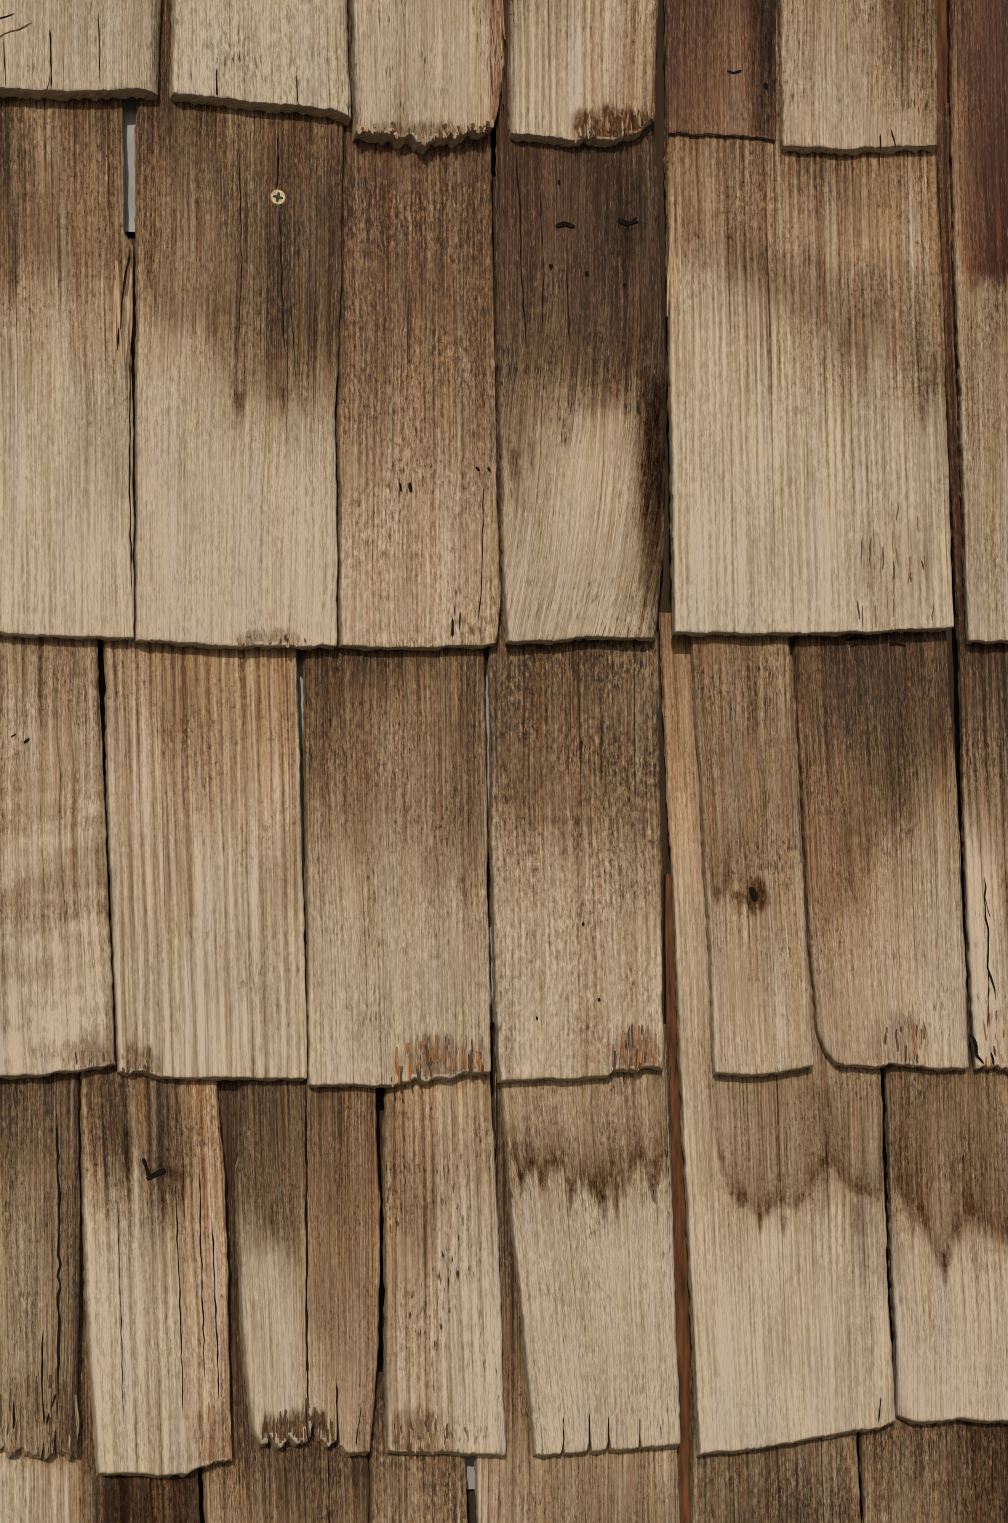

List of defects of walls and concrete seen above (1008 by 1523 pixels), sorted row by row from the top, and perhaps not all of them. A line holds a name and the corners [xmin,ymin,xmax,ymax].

damp [513,1145,564,1191]
damp [580,1146,667,1211]
damp [732,1186,800,1227]
damp [896,1175,1008,1273]